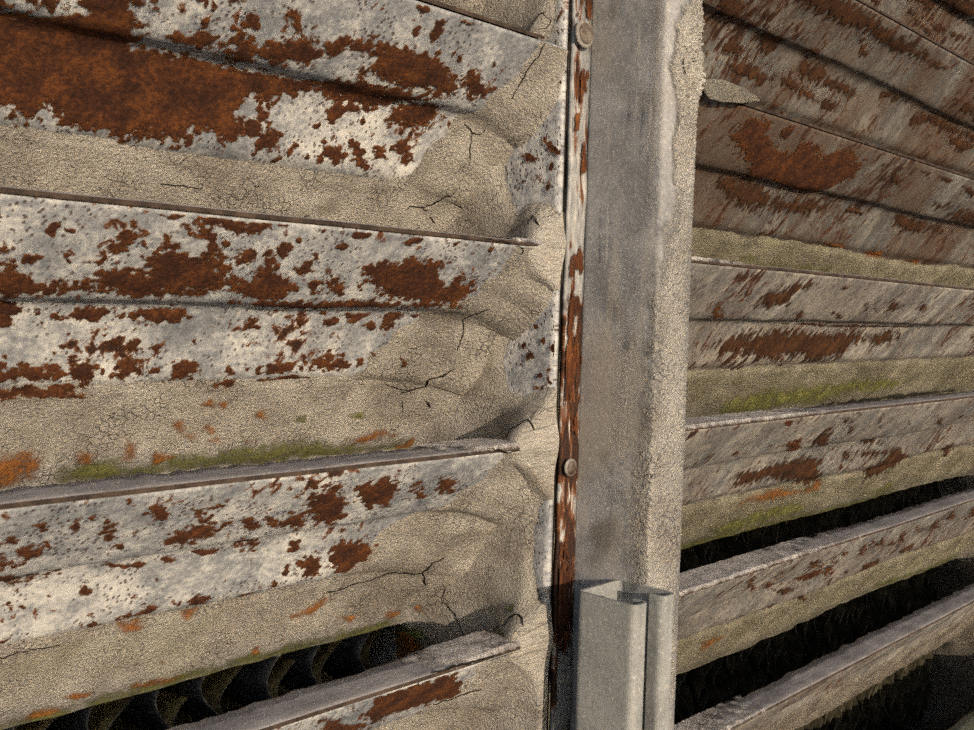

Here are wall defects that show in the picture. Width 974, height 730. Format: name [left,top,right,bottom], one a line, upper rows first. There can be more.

rust [0,0,497,172]
crack [512,11,551,98]
crack [487,215,540,255]
rust [0,214,481,402]
crack [386,309,490,408]
rust [711,276,927,363]
water stain [791,389,962,409]
rust [734,416,858,507]
rust [160,473,462,588]
crack [326,557,465,636]
rust [316,672,467,730]
crack [432,653,503,674]